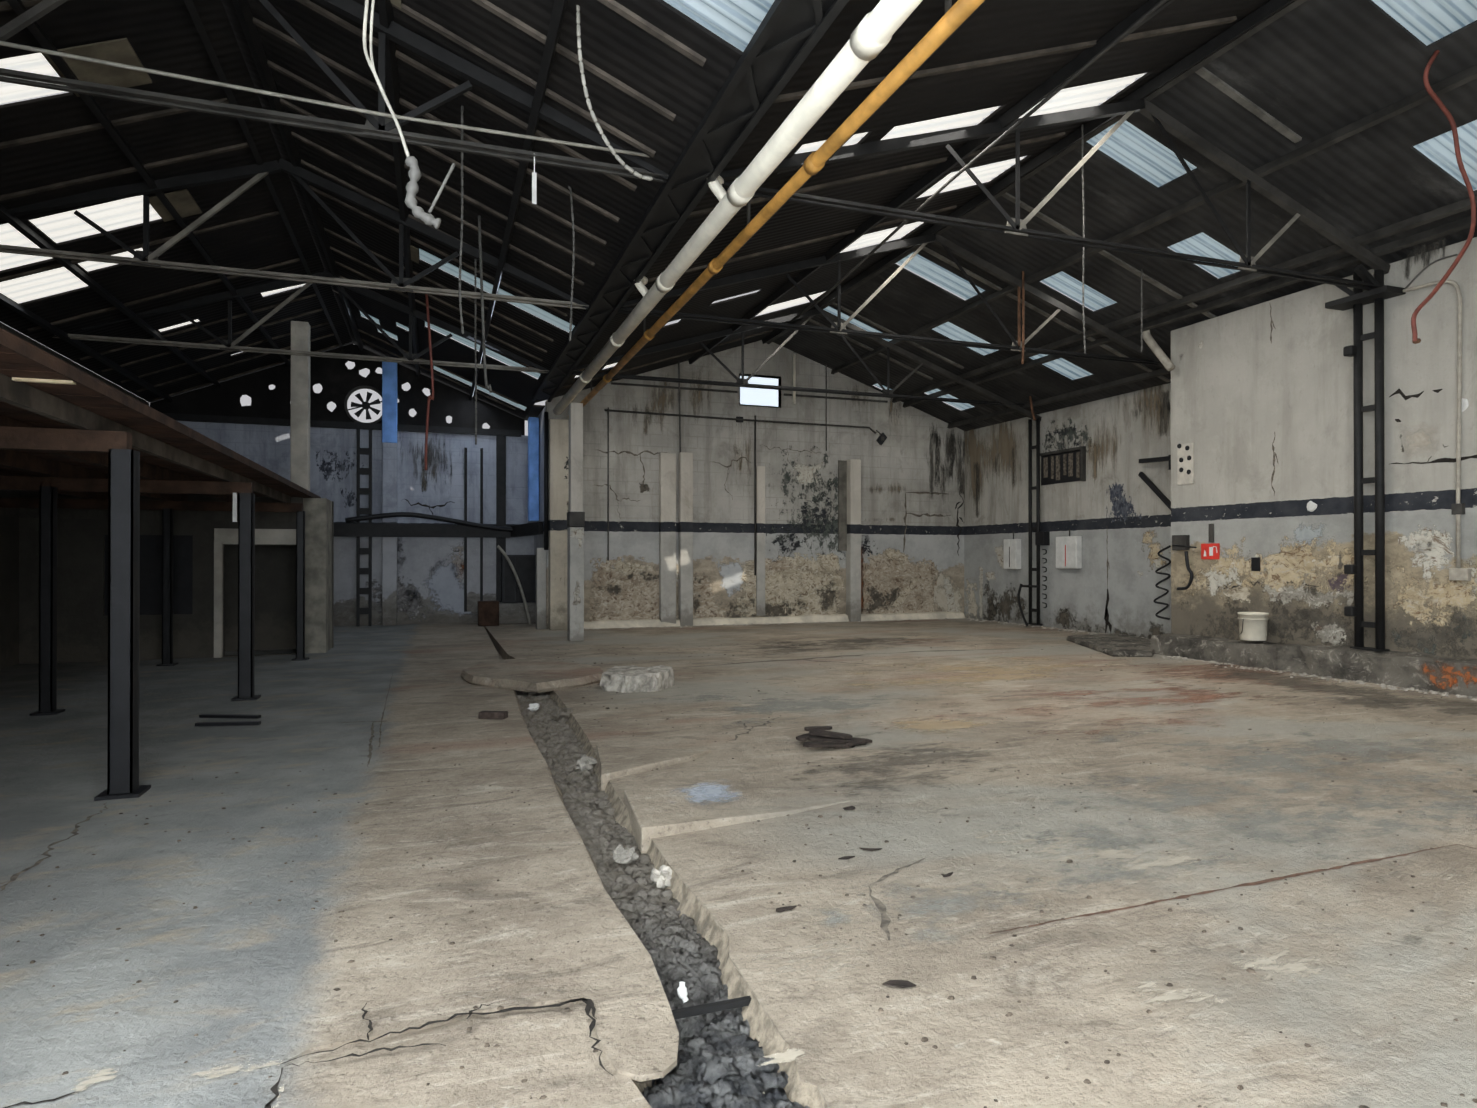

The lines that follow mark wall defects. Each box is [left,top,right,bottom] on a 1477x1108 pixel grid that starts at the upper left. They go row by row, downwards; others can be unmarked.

crack [1389,388,1442,422]
water stain [766,446,878,561]
water stain [929,421,1021,517]
crack [1391,445,1477,464]
spalling [567,501,845,622]
spalling [863,548,939,614]
peeling [1185,523,1368,609]
peeling [1390,521,1477,637]
rust [1423,661,1477,689]
crack [264,998,613,1108]
crack [3,1089,86,1108]